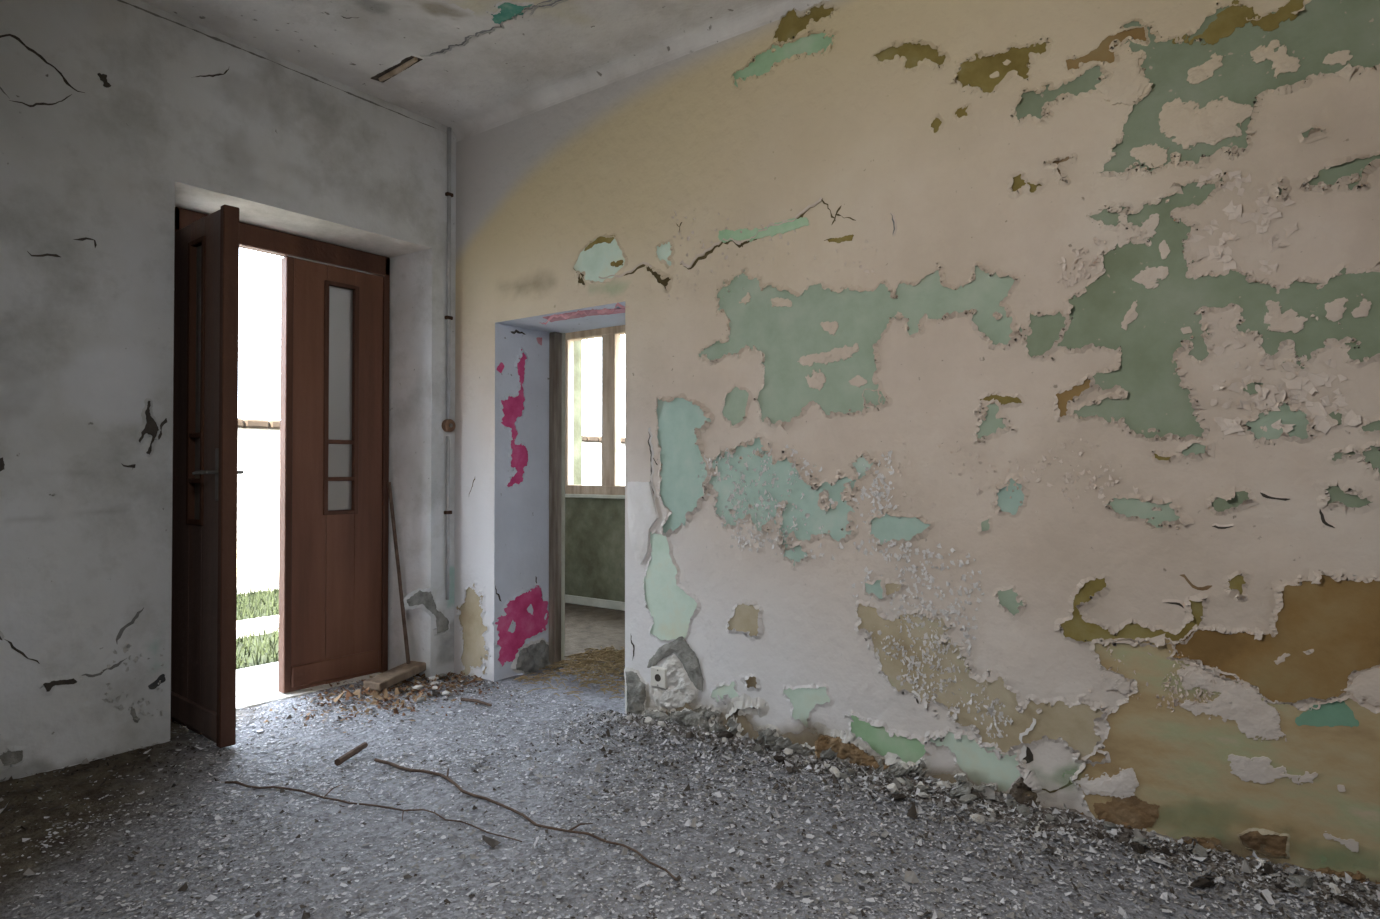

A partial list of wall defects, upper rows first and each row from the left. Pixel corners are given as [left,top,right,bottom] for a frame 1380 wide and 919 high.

peeling [486,1,534,24]
crack [0,34,85,107]
crack [117,0,446,133]
flaking render [368,54,425,83]
peeling [571,233,675,293]
peeling [543,308,625,322]
peeling [497,337,542,489]
flaking render [619,0,1380,914]
crack [0,631,40,664]
crack [81,608,144,677]
flaking render [0,745,28,770]